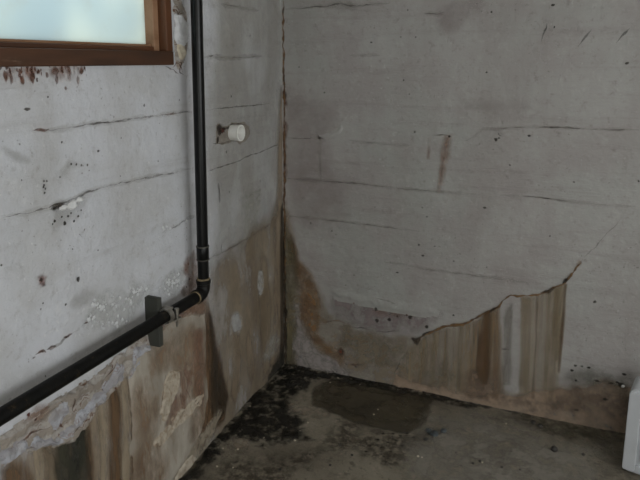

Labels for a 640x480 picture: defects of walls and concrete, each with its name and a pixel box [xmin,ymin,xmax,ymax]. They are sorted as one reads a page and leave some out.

rust [3,66,85,84]
peeling [168,0,189,74]
crack [218,1,287,364]
damp [174,90,631,480]
damp [3,377,134,480]
peeling [0,303,208,480]